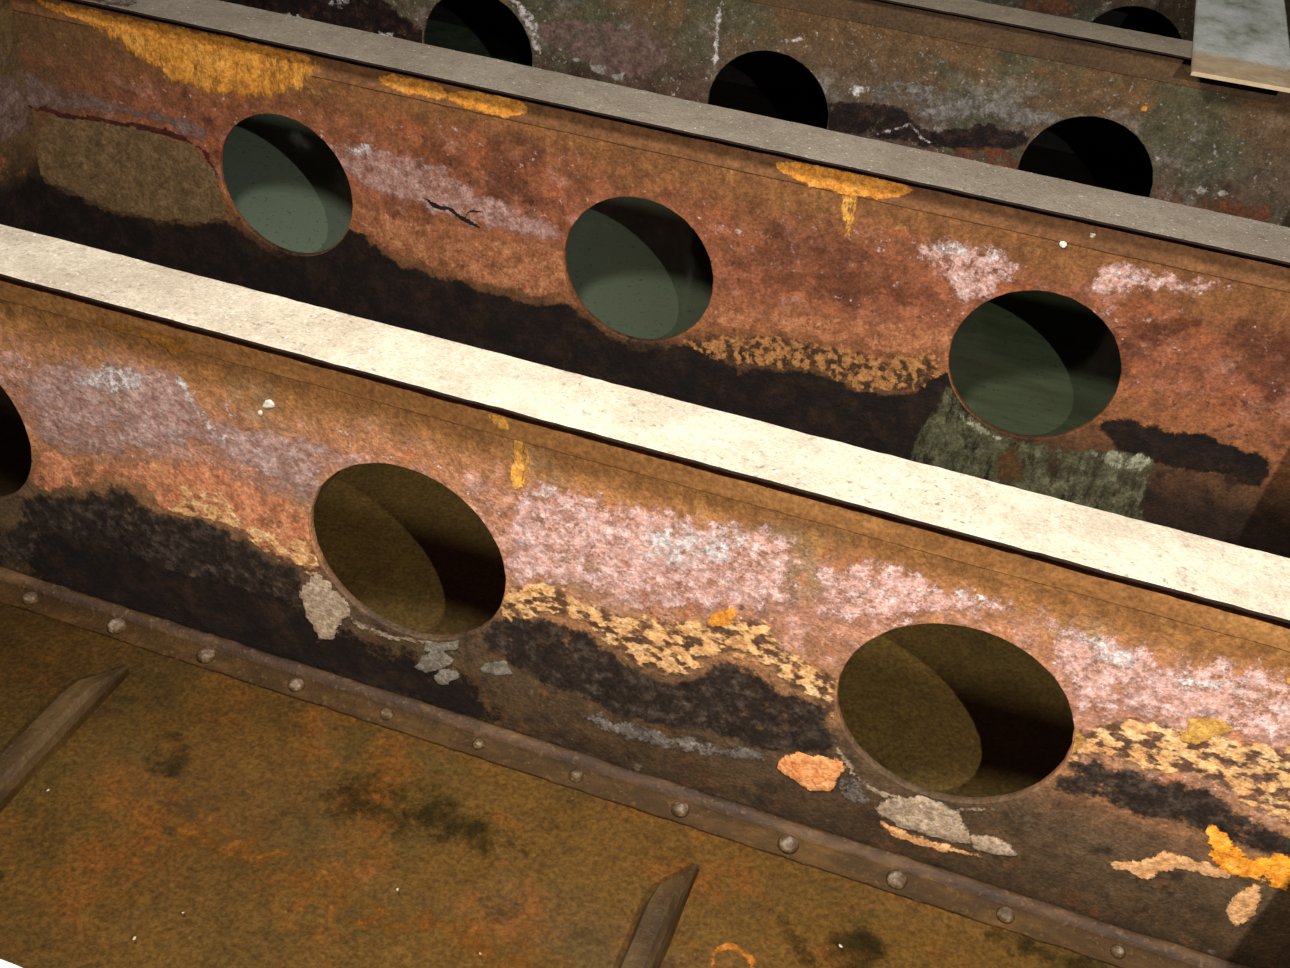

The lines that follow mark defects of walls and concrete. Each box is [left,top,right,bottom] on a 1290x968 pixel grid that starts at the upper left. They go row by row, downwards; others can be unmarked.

spalling [219,0,423,43]
crack [424,198,481,228]
damp [0,177,1269,521]
damp [500,481,801,614]
peeling [299,573,350,640]
damp [483,616,837,753]
rust [501,583,836,716]
damp [815,558,1290,740]
rust [777,747,898,798]
peeling [875,795,1017,857]
rust [1068,718,1290,825]
rust [1109,825,1290,891]